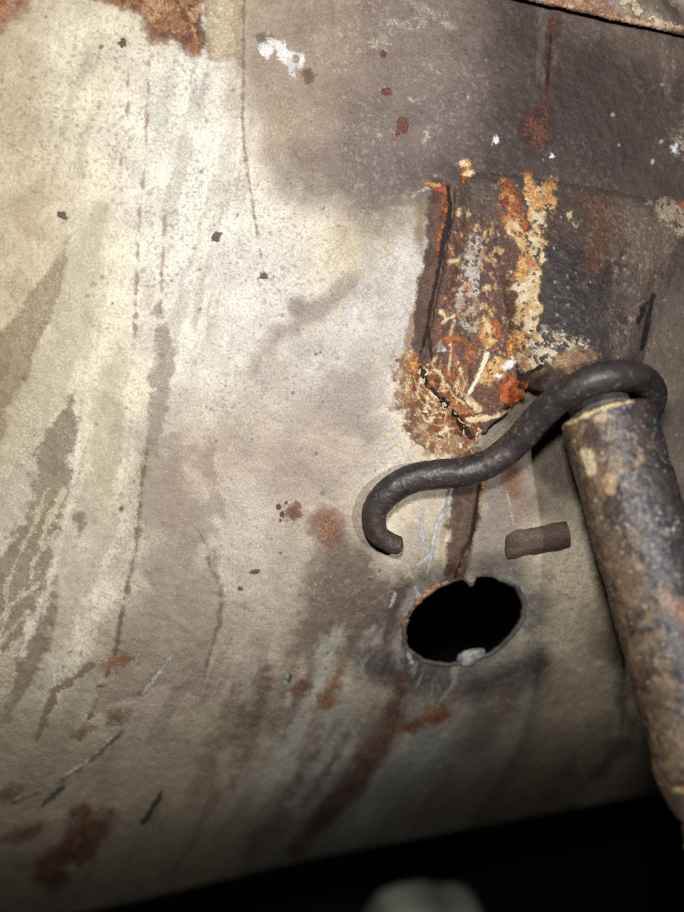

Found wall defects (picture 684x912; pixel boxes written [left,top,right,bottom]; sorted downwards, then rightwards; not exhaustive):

corrosion [0,0,29,29]
corrosion [96,0,207,57]
corrosion [519,0,684,150]
corrosion [498,178,529,238]
corrosion [390,348,481,459]
corrosion [498,377,528,407]
damp [0,207,223,831]
corrosion [401,481,487,627]
corrosion [33,803,113,889]